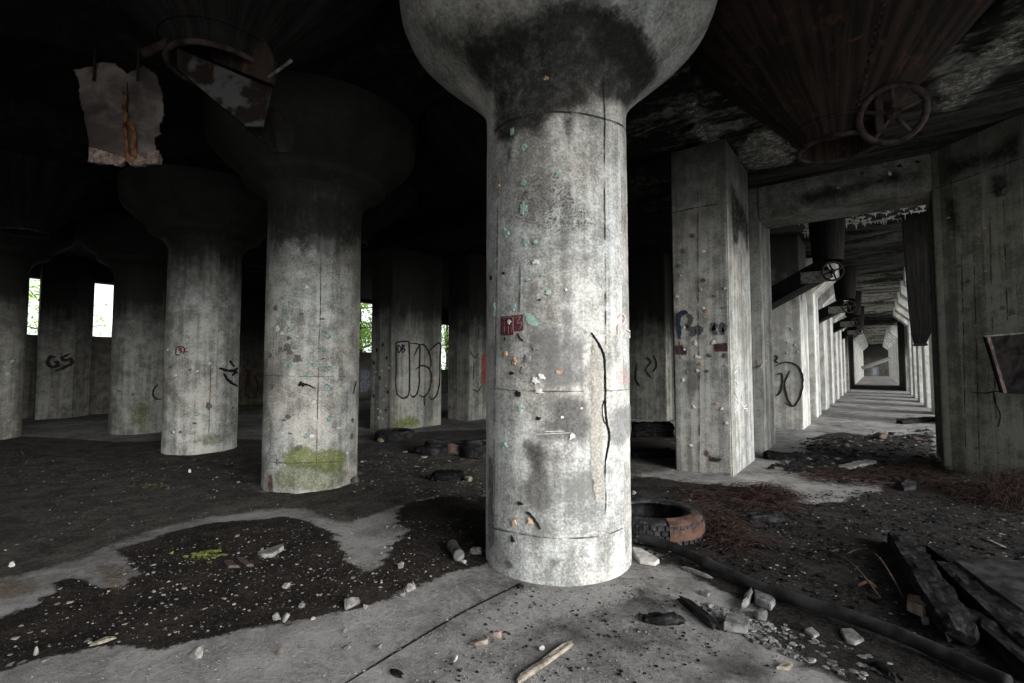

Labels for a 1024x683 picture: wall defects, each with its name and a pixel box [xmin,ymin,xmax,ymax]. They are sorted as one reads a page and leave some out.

corrosion [74,48,165,168]